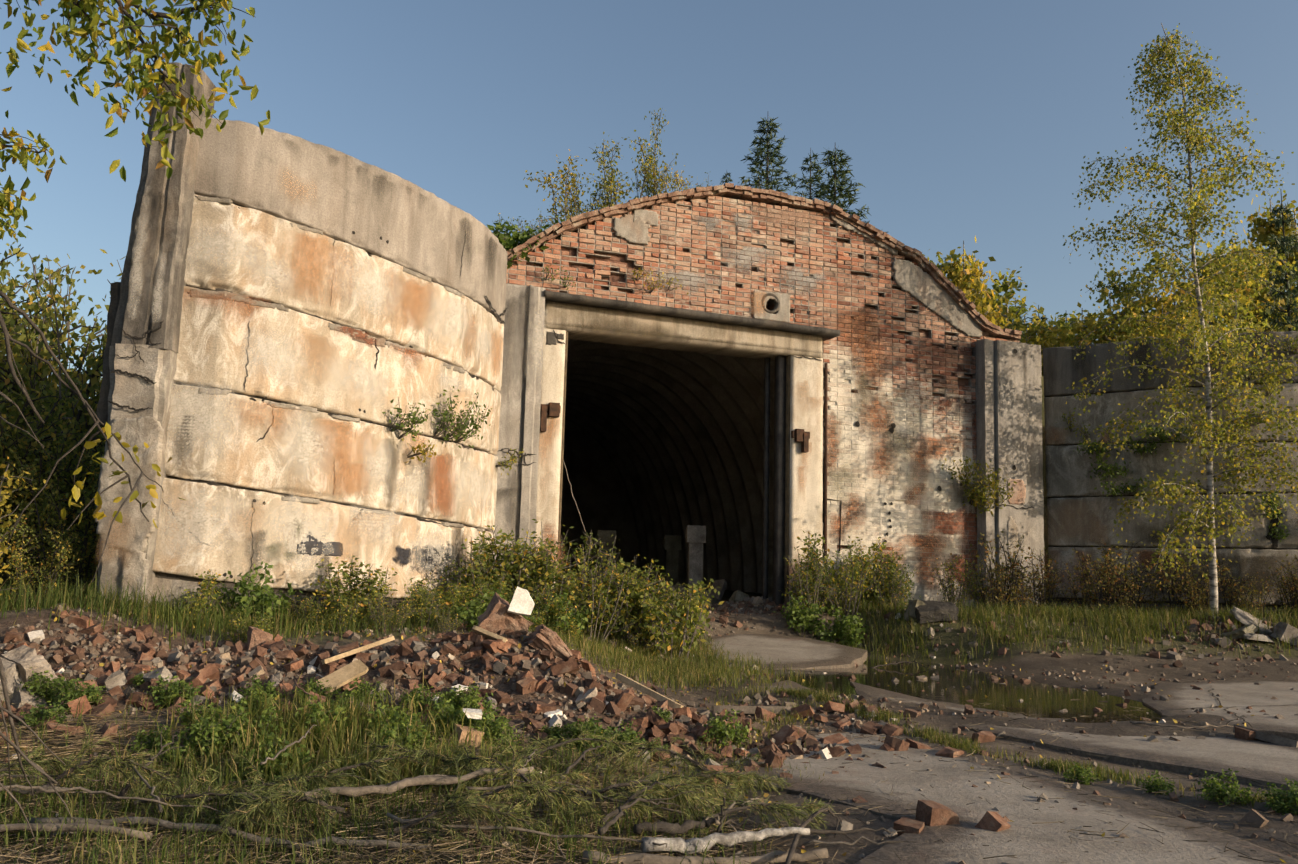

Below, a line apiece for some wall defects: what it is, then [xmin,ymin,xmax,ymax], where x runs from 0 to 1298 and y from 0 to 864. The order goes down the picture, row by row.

crack [108,322,163,411]
crack [238,227,433,442]
rust [341,326,373,345]
crack [460,234,507,391]
peeling [840,309,892,474]
flaking render [829,214,982,447]
peeling [907,435,952,500]
peeling [832,497,861,534]
peeling [879,508,977,599]